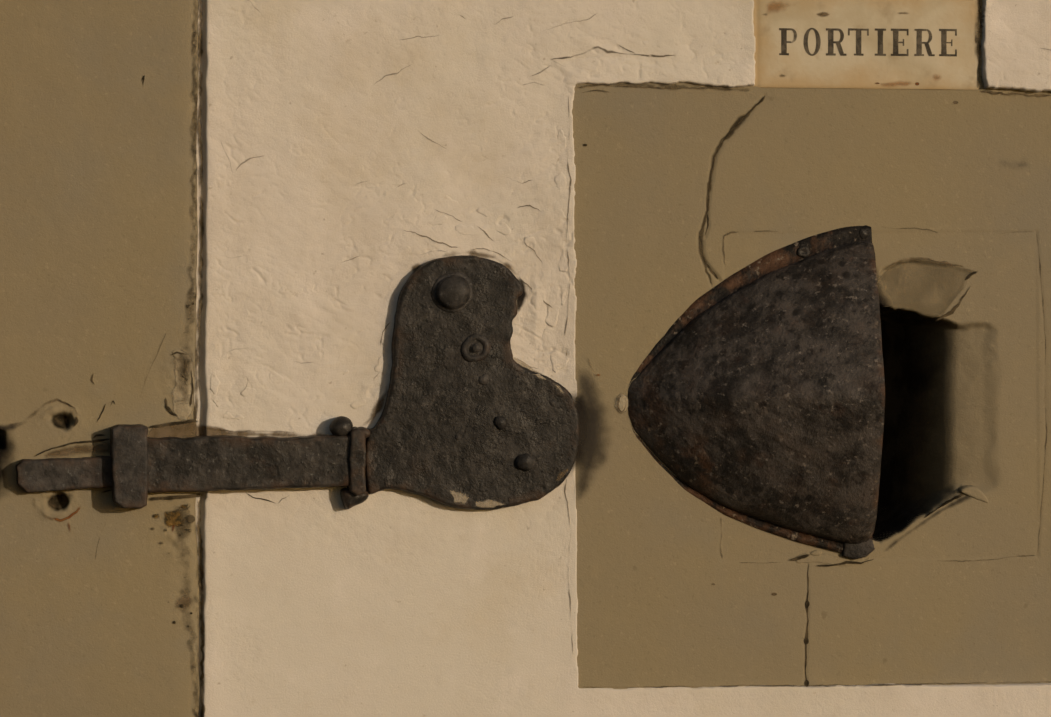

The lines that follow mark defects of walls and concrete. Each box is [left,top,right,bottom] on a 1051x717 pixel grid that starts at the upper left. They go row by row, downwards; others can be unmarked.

crack [599,46,673,57]
crack [977,8,1051,97]
crack [568,83,733,109]
crack [565,165,573,229]
crack [699,97,765,284]
spalling [877,258,977,321]
crack [765,564,985,687]